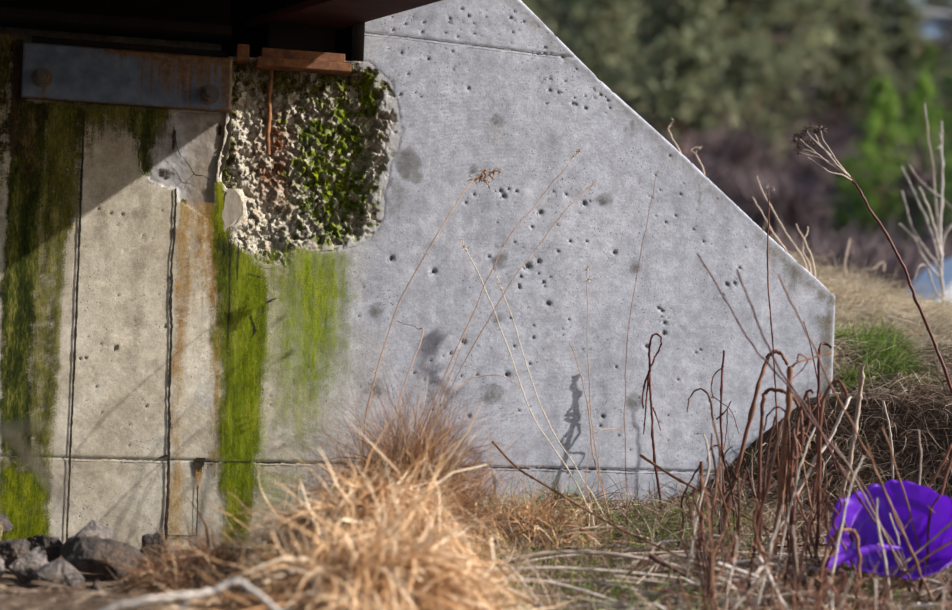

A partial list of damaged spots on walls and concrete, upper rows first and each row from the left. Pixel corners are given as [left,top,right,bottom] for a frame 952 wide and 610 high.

leakage [0,39,96,541]
rust [168,422,185,543]
crack [3,111,358,541]
rust [171,202,216,397]
leakage [193,187,348,547]
spalling [137,48,415,272]